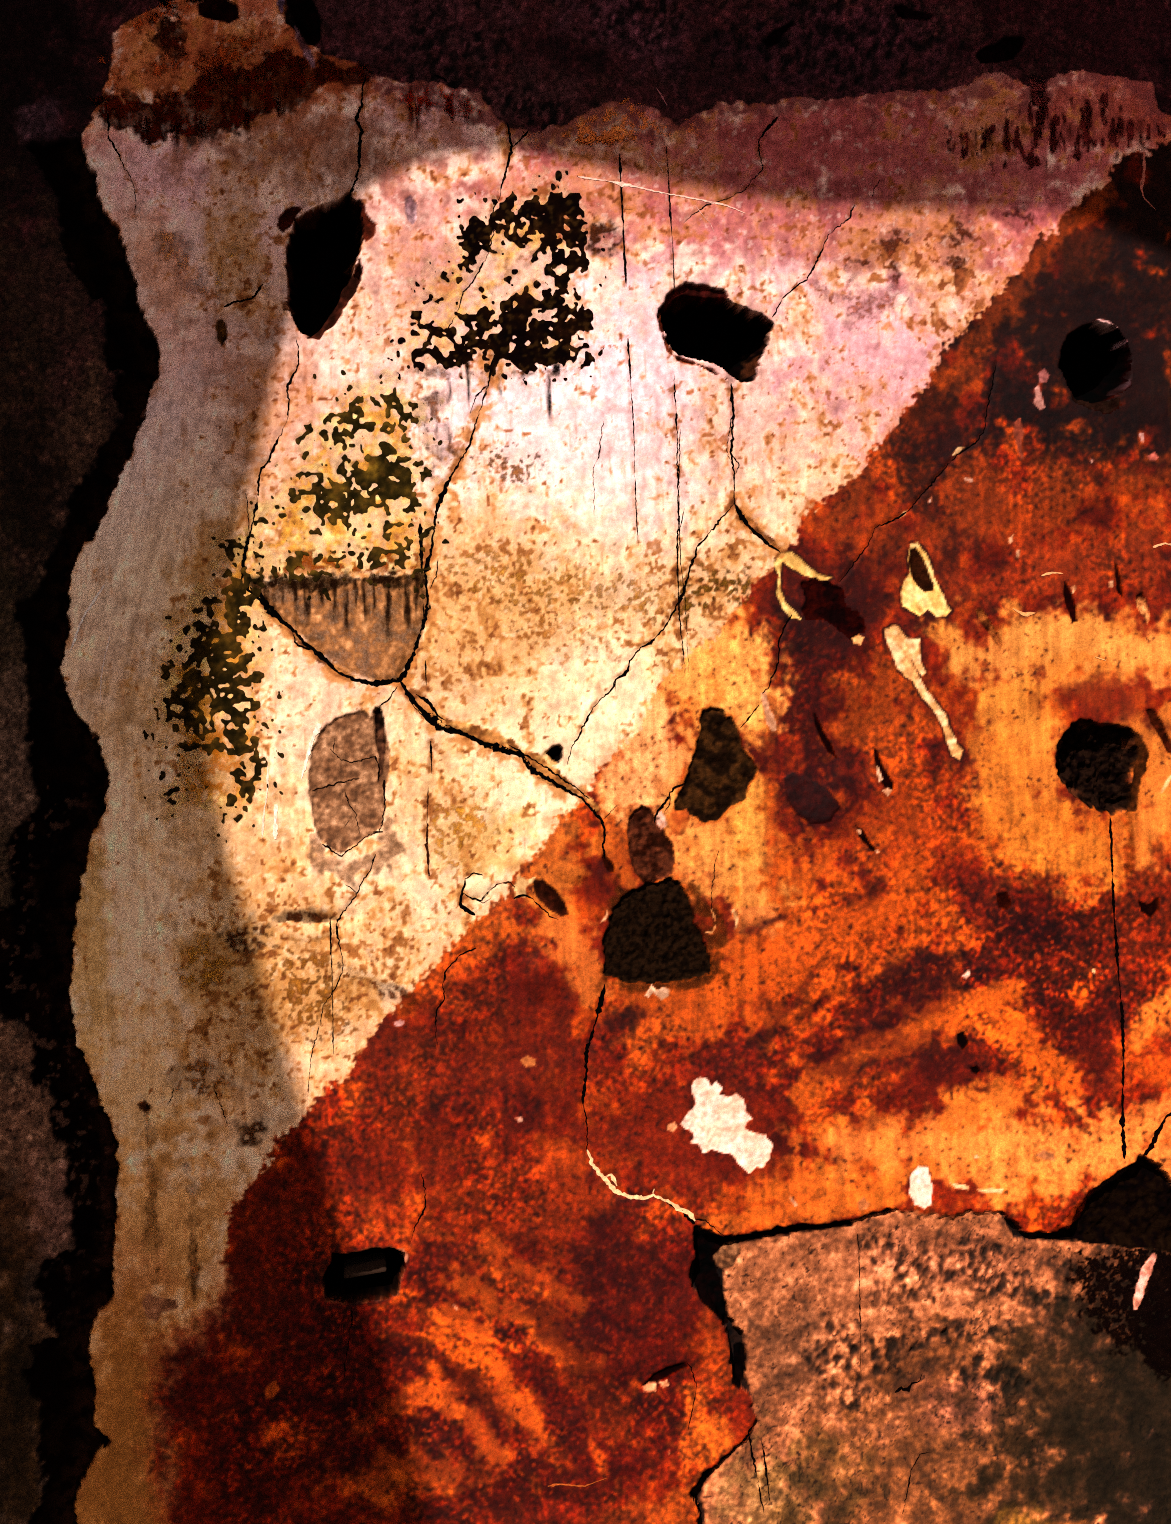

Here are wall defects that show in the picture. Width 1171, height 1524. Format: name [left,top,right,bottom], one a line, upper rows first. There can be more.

corrosion [93,2,371,146]
corrosion [576,101,667,144]
corrosion [181,725,246,791]
corrosion [272,548,394,577]
damp [249,570,429,680]
peeling [143,170,605,857]
crack [241,338,780,1045]
spalling [601,708,759,1001]
crack [1109,818,1171,1159]
crack [581,984,723,1247]
peeling [668,1077,774,1174]
spalling [1027,1156,1171,1310]